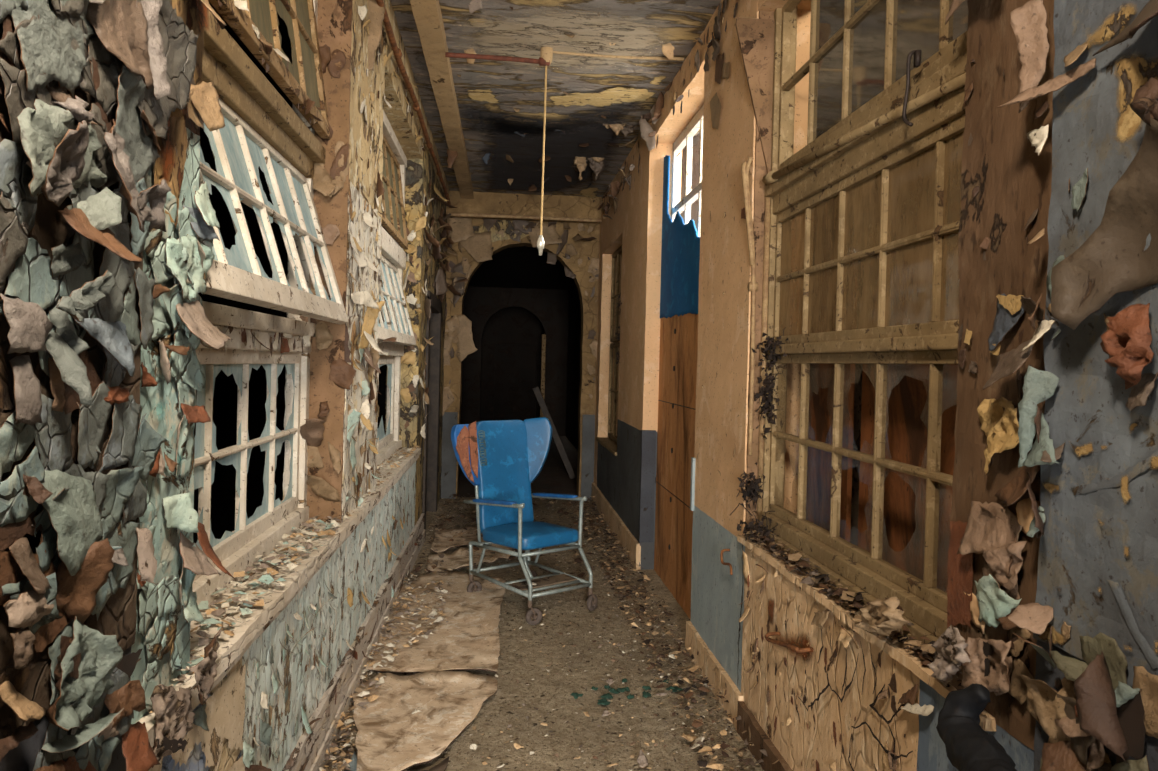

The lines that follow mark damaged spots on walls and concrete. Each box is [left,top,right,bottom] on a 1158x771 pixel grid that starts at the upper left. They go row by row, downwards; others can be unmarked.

peeling [0,0,738,771]